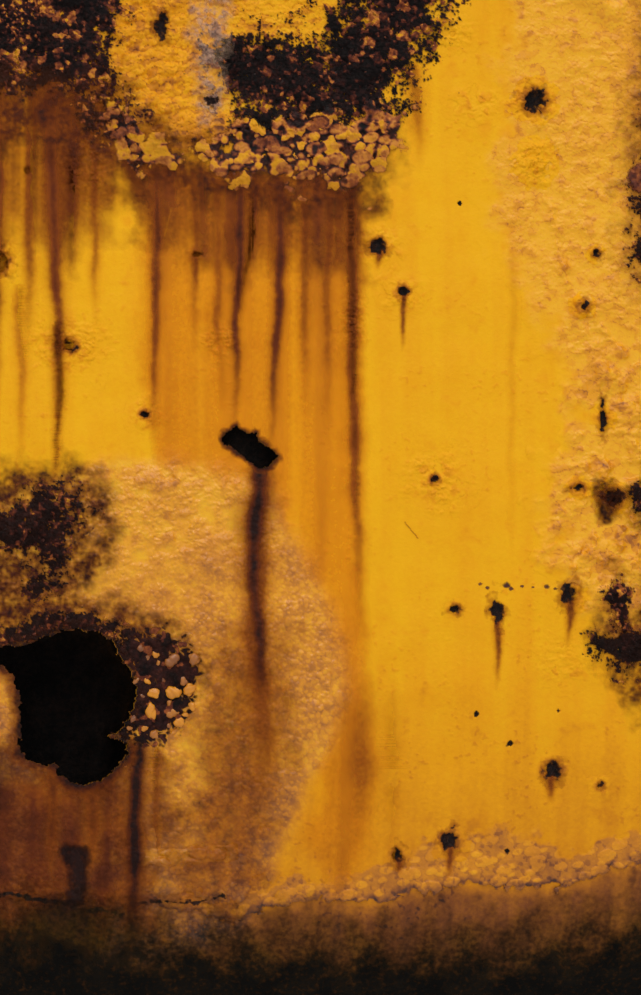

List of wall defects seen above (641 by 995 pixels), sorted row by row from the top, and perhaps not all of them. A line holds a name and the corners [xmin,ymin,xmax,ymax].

corrosion [190,0,469,132]
corrosion [0,0,156,458]
corrosion [622,183,641,282]
corrosion [0,468,127,664]
corrosion [128,164,373,875]
corrosion [628,480,641,514]
corrosion [580,573,641,684]
spalling [383,843,412,872]
spalling [425,816,473,870]